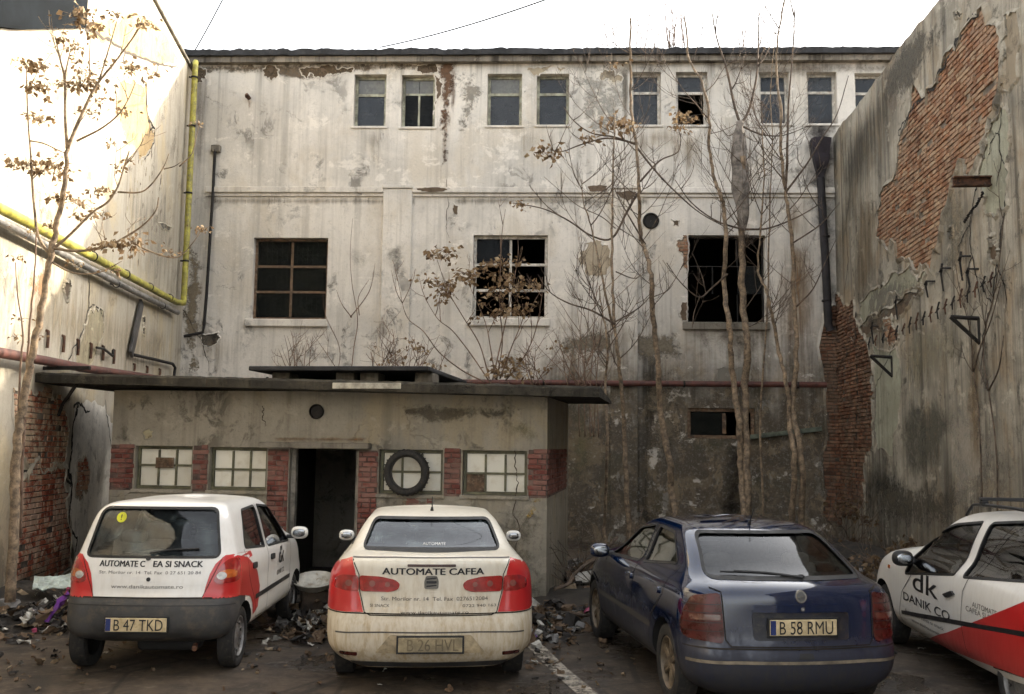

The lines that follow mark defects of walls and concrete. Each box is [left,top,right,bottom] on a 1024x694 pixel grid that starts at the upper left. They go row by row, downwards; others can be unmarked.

flaking render [299,64,355,80]
flaking render [670,218,690,274]
flaking render [817,1,1022,527]
flaking render [12,384,113,582]
water stain [405,406,505,422]
water stain [638,334,682,450]
water stain [866,393,1011,524]